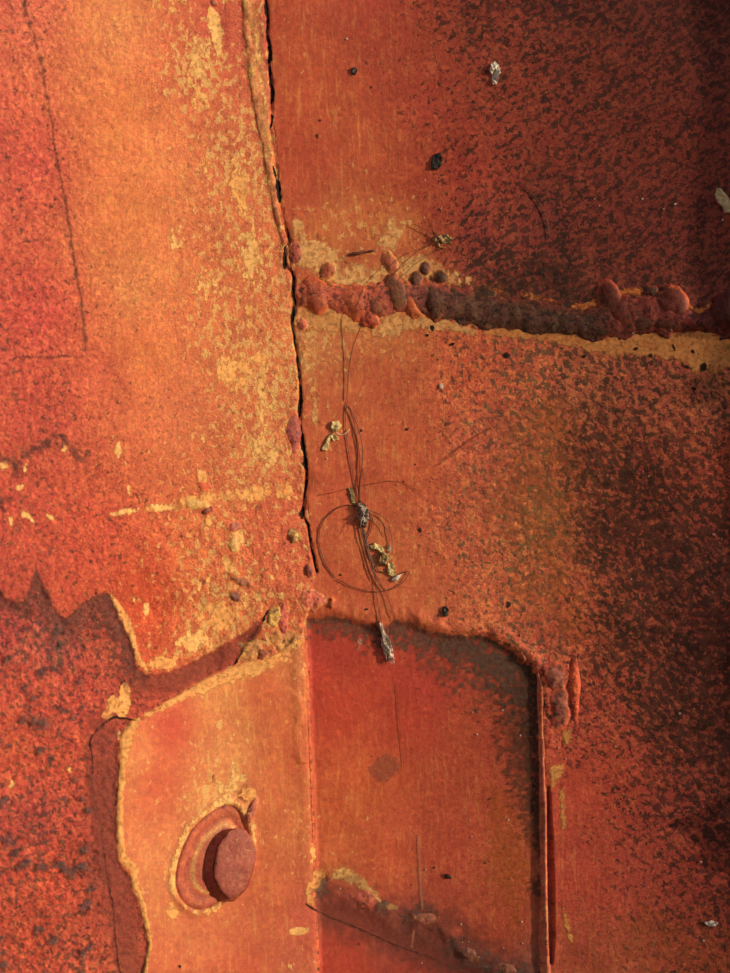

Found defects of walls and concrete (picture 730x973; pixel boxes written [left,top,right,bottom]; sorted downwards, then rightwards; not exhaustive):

crack [264,0,275,129]
crack [272,166,282,203]
crack [283,228,316,571]
peeling [223,557,238,574]
peeling [110,592,261,673]
peeling [101,652,288,973]
peeling [289,927,309,935]